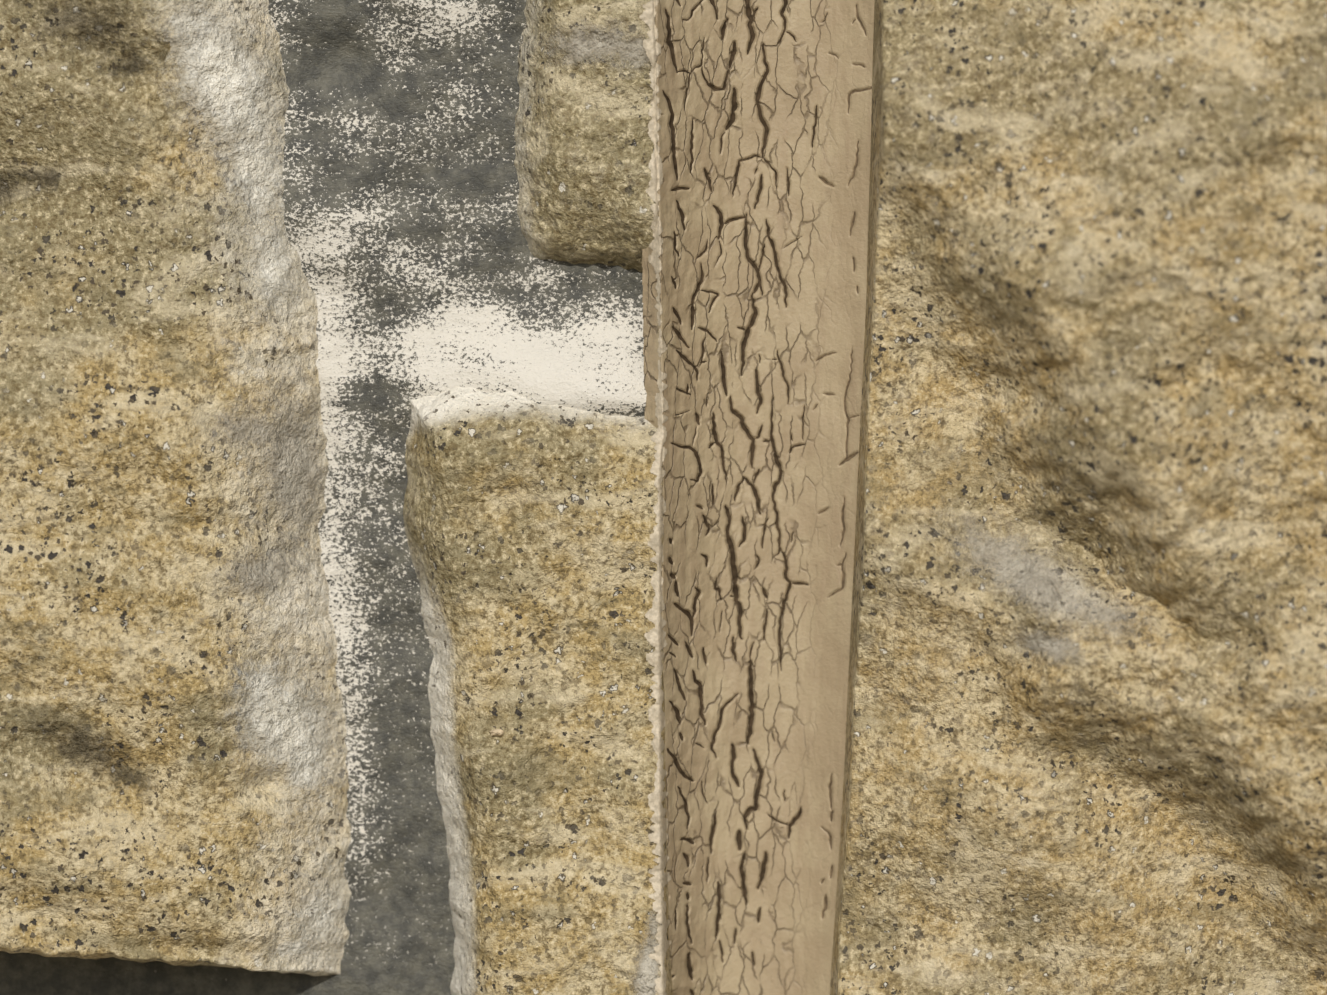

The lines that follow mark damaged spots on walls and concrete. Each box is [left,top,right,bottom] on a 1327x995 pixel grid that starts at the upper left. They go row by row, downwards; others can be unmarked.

crack [662,0,872,995]